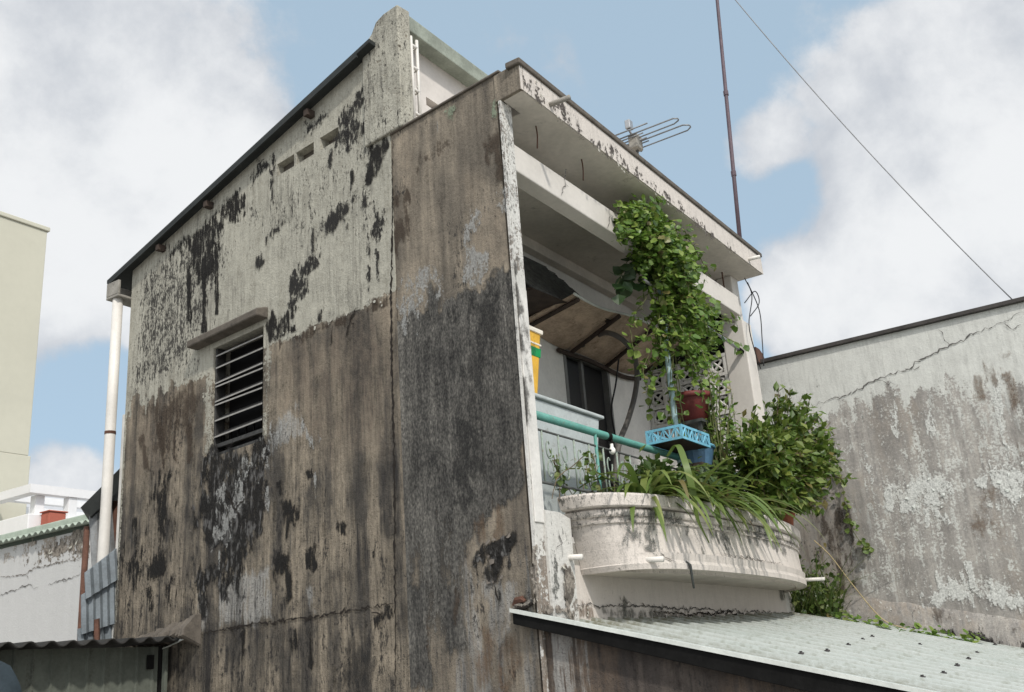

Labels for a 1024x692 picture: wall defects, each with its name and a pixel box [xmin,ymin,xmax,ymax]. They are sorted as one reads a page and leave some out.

peeling [521,72,736,254]
leakage [157,153,276,333]
leakage [255,217,286,271]
leakage [265,87,411,343]
crack [812,312,1020,406]
leakage [117,379,300,620]
leakage [396,210,532,692]
peeling [884,467,954,528]
crack [1,559,81,595]
leakage [305,542,317,581]
leakage [366,605,393,628]
peeling [920,560,1024,616]